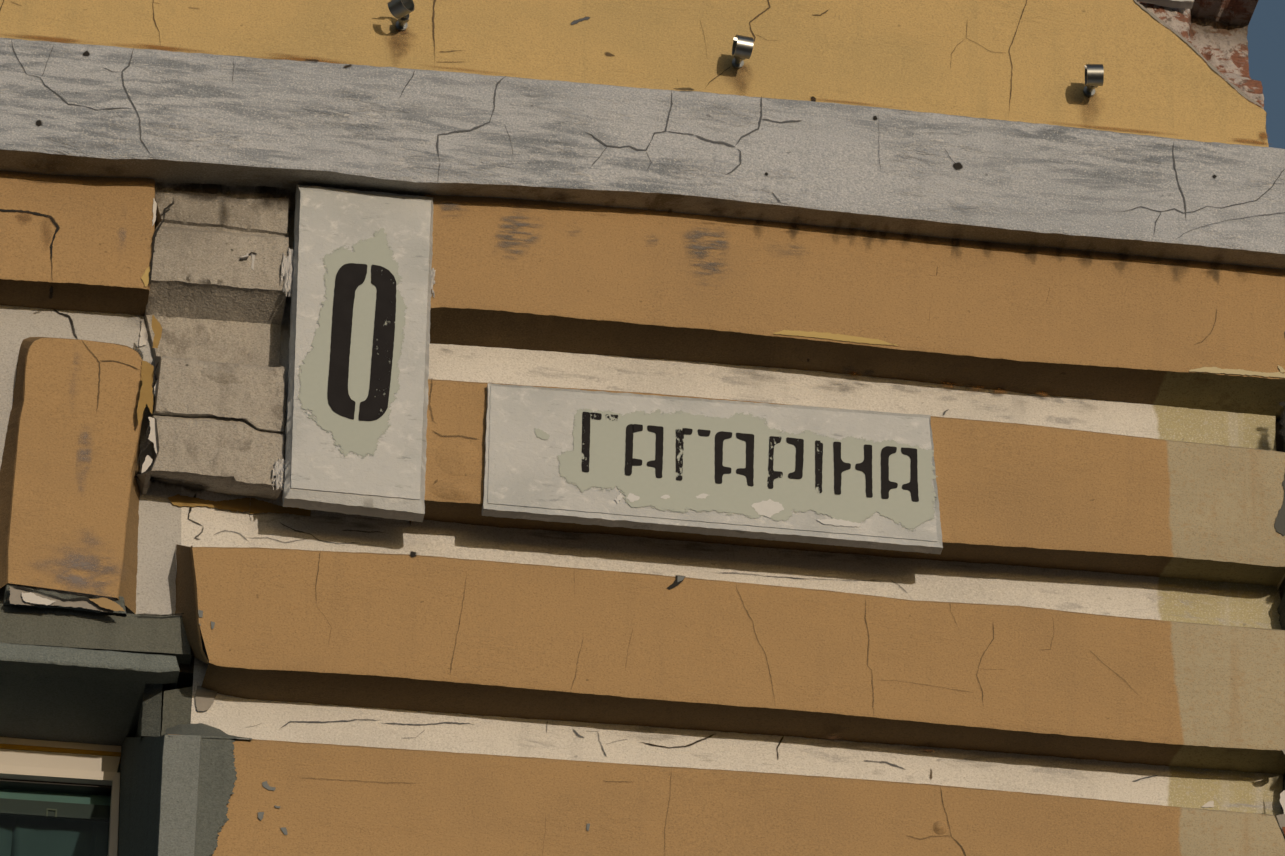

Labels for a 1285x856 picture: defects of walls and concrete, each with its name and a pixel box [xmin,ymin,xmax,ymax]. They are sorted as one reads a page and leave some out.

crack [12,0,160,154]
crack [749,0,776,43]
crack [951,0,1027,110]
spalling [1134,0,1264,110]
crack [436,78,513,178]
crack [586,91,802,175]
crack [1126,143,1285,236]
crack [0,199,384,600]
crack [723,572,897,704]
crack [977,626,994,700]
crack [864,760,966,856]
spalling [1277,790,1285,836]